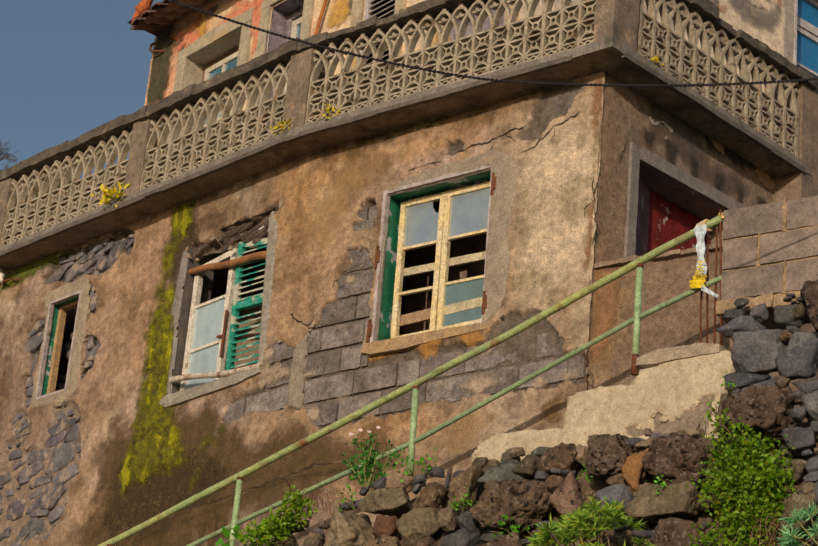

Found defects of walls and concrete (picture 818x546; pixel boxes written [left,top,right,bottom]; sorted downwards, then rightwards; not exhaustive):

water stain [731,0,781,29]
crack [407,111,582,172]
spalling [46,231,135,315]
water stain [170,207,200,314]
spalling [185,198,284,264]
spalling [0,317,81,546]
spalling [80,333,101,378]
spalling [223,339,294,424]
spalling [302,246,594,426]
flaking render [626,395,719,437]